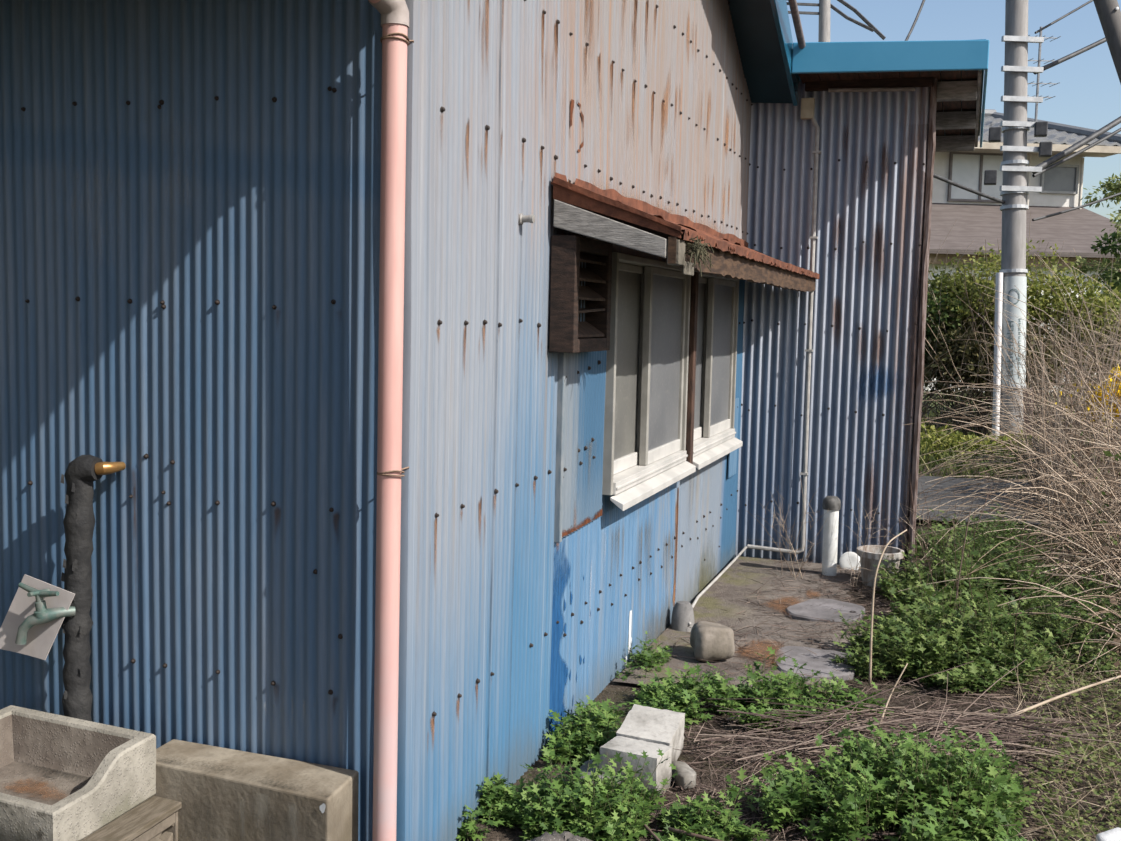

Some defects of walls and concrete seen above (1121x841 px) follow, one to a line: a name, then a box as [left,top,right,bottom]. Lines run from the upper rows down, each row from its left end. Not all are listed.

rust [624,0,657,40]
rust [585,48,635,120]
rust [651,83,677,137]
rust [875,225,884,271]
rust [910,252,923,441]
rust [557,509,602,546]